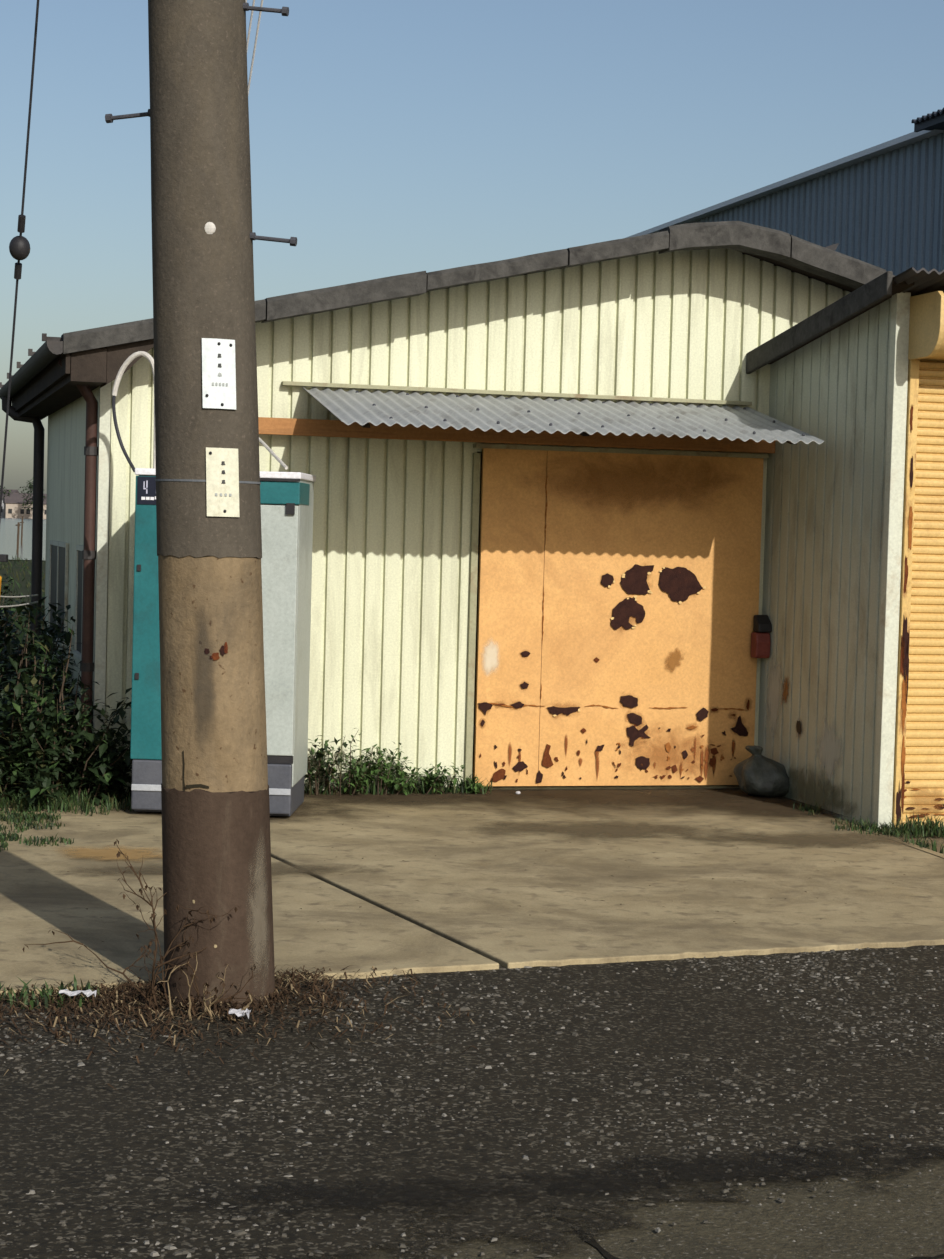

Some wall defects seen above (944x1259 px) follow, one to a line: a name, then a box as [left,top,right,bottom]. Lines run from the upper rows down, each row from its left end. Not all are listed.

corrosion [904,507,913,593]
corrosion [478,682,750,783]
corrosion [896,617,944,825]
crack [555,1210,620,1259]
crack [910,1251,944,1259]